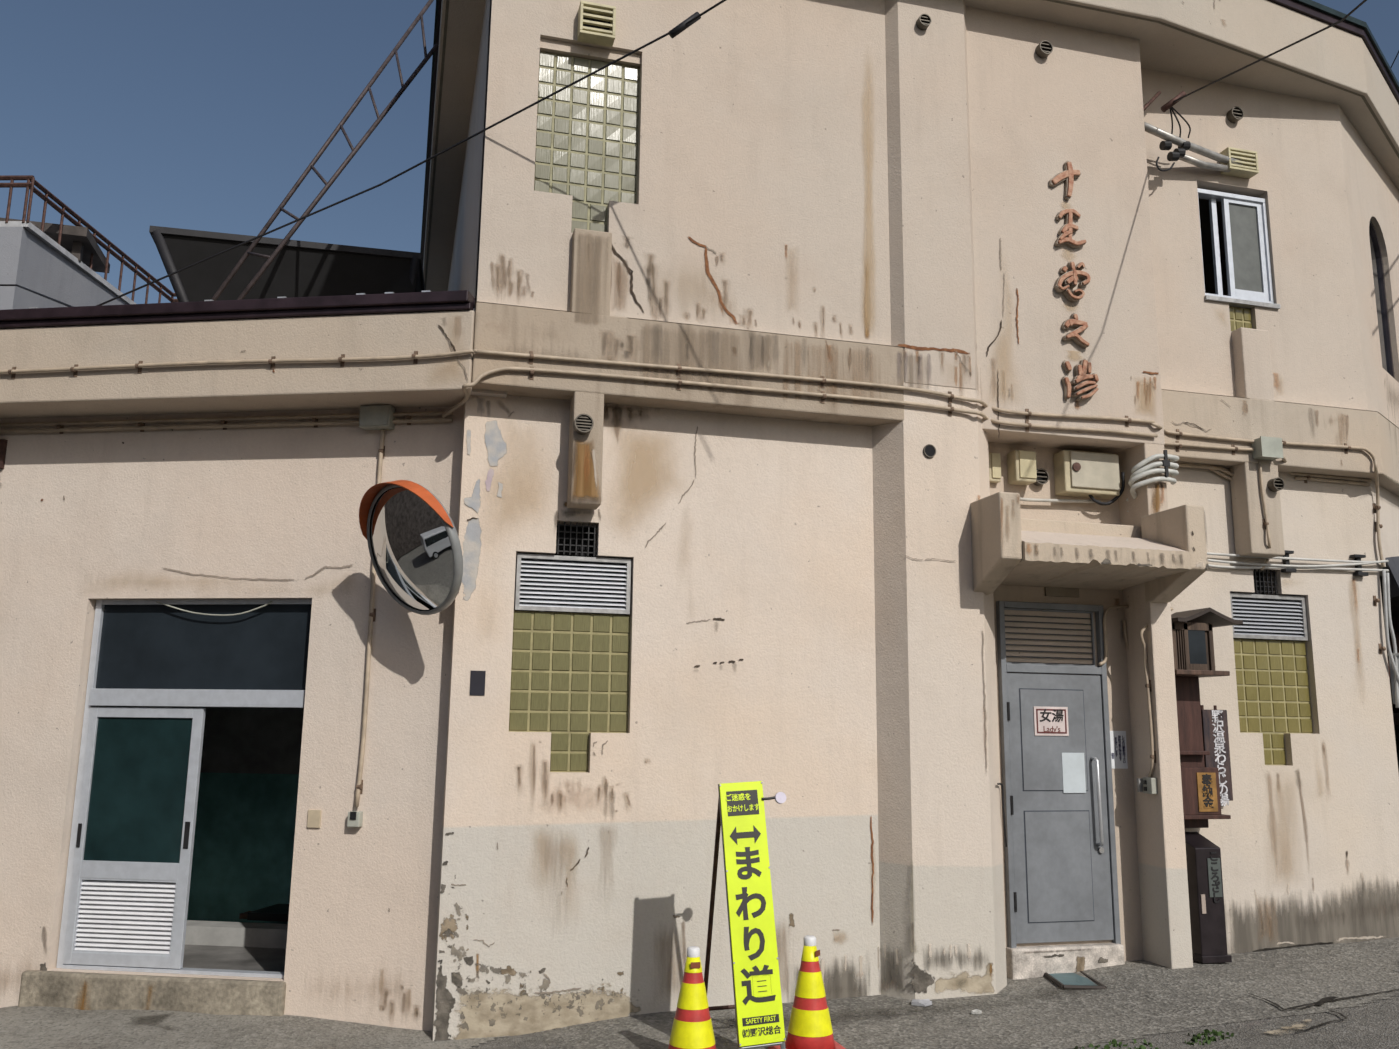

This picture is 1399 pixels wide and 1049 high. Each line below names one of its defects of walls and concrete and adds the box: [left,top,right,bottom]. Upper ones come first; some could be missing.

crack [612,245,644,313]
crack [688,237,737,324]
peeling [462,420,507,601]
crack [164,565,352,580]
flaking render [433,861,624,1041]